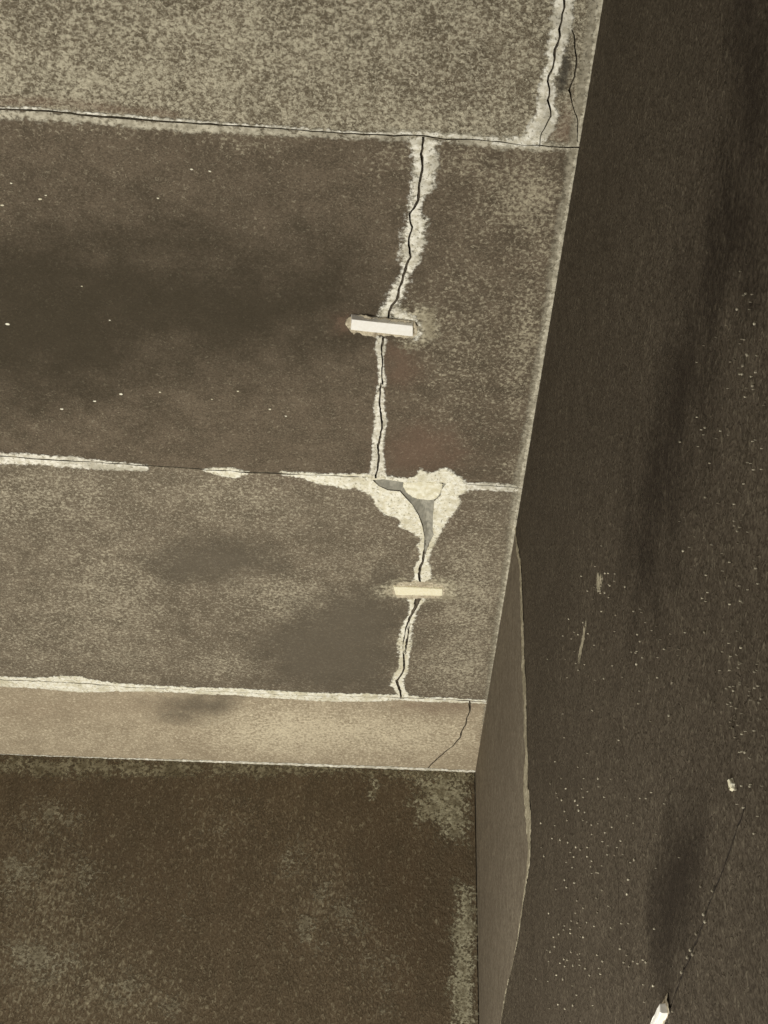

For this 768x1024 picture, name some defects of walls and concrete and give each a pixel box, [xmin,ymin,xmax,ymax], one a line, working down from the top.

crack [491,0,578,147]
crack [369,136,441,478]
spalling [353,467,469,553]
crack [390,537,437,697]
crack [428,700,471,768]